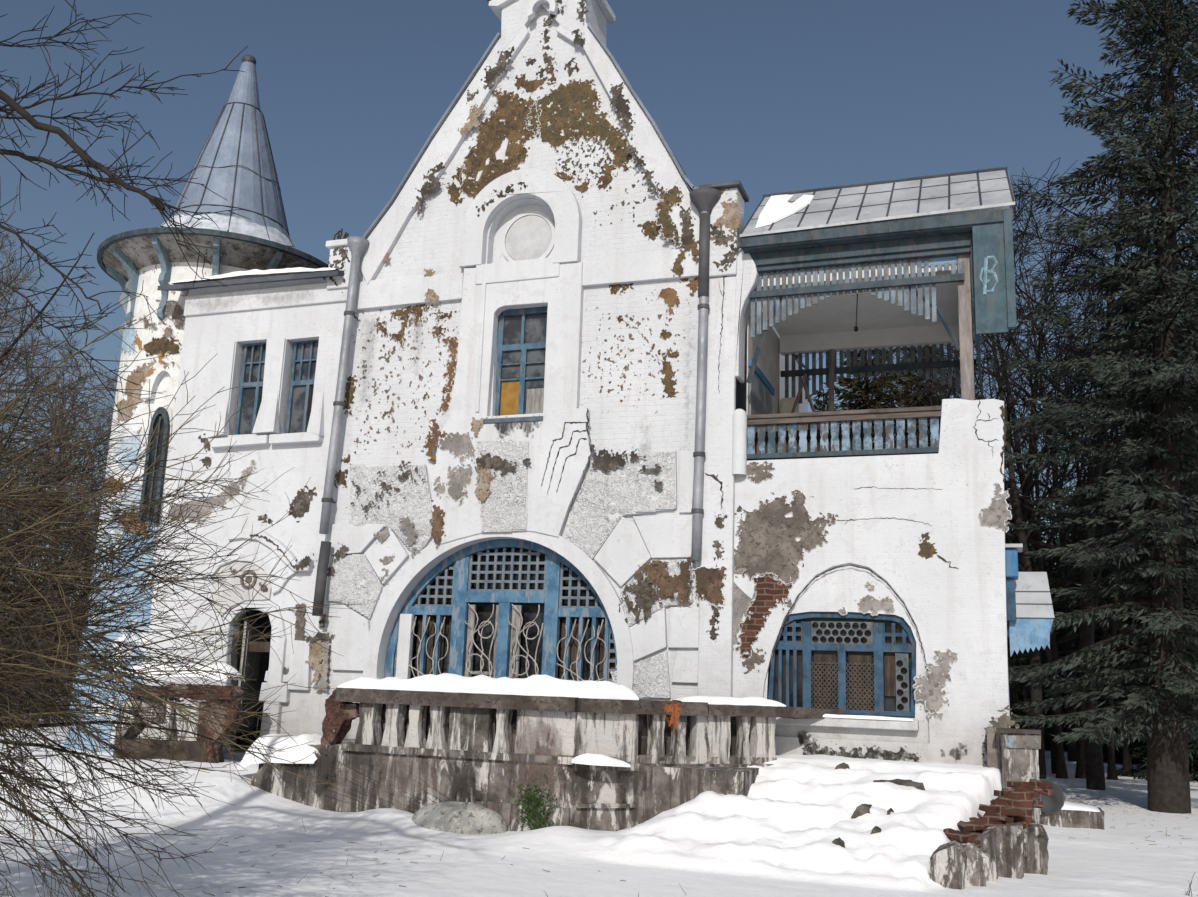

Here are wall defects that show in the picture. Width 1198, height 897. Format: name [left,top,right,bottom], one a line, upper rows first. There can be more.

flaking render [412,0,743,413]
flaking render [104,299,186,495]
flaking render [89,459,257,603]
flaking render [198,433,211,469]
flaking render [288,486,317,523]
flaking render [334,268,531,582]
flaking render [590,444,663,490]
flaking render [619,460,838,674]
crack [973,401,1008,482]
flaking render [978,482,1012,533]
rust [663,703,681,734]
flaking render [912,648,959,721]